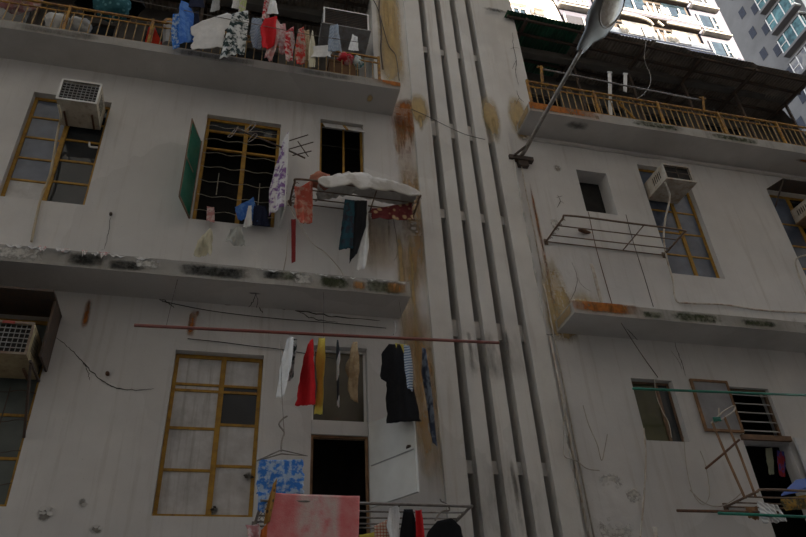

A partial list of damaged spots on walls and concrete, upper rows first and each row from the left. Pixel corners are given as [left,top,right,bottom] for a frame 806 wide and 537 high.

rust [394,101,414,154]
water stain [71,254,101,265]
water stain [111,261,141,270]
water stain [184,265,242,279]
rust [575,300,633,314]